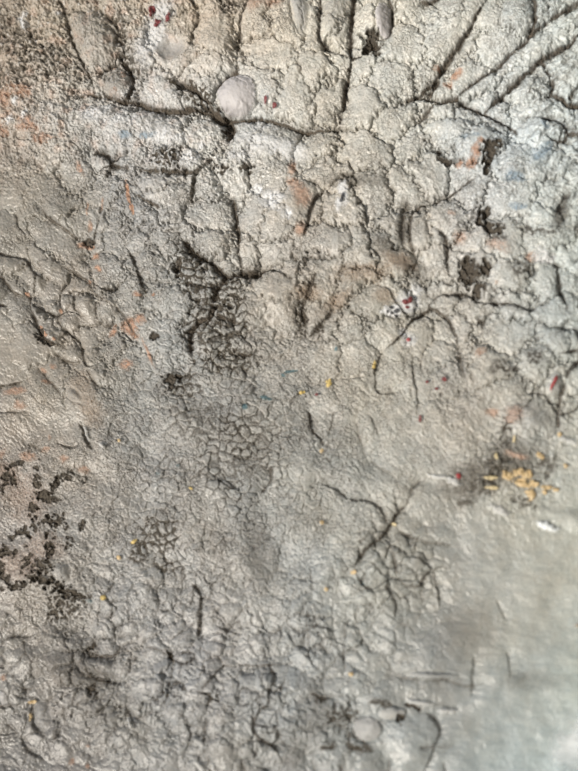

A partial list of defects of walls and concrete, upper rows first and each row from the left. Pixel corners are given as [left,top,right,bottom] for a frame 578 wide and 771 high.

crack [59,0,394,142]
crack [401,0,578,144]
crack [94,152,212,203]
crack [303,193,324,235]
crack [409,176,478,268]
spalling [475,205,506,235]
crack [0,253,137,378]
crack [174,201,333,364]
crack [374,286,539,393]
spalling [458,255,492,301]
spalling [0,458,86,599]
crack [192,585,202,636]